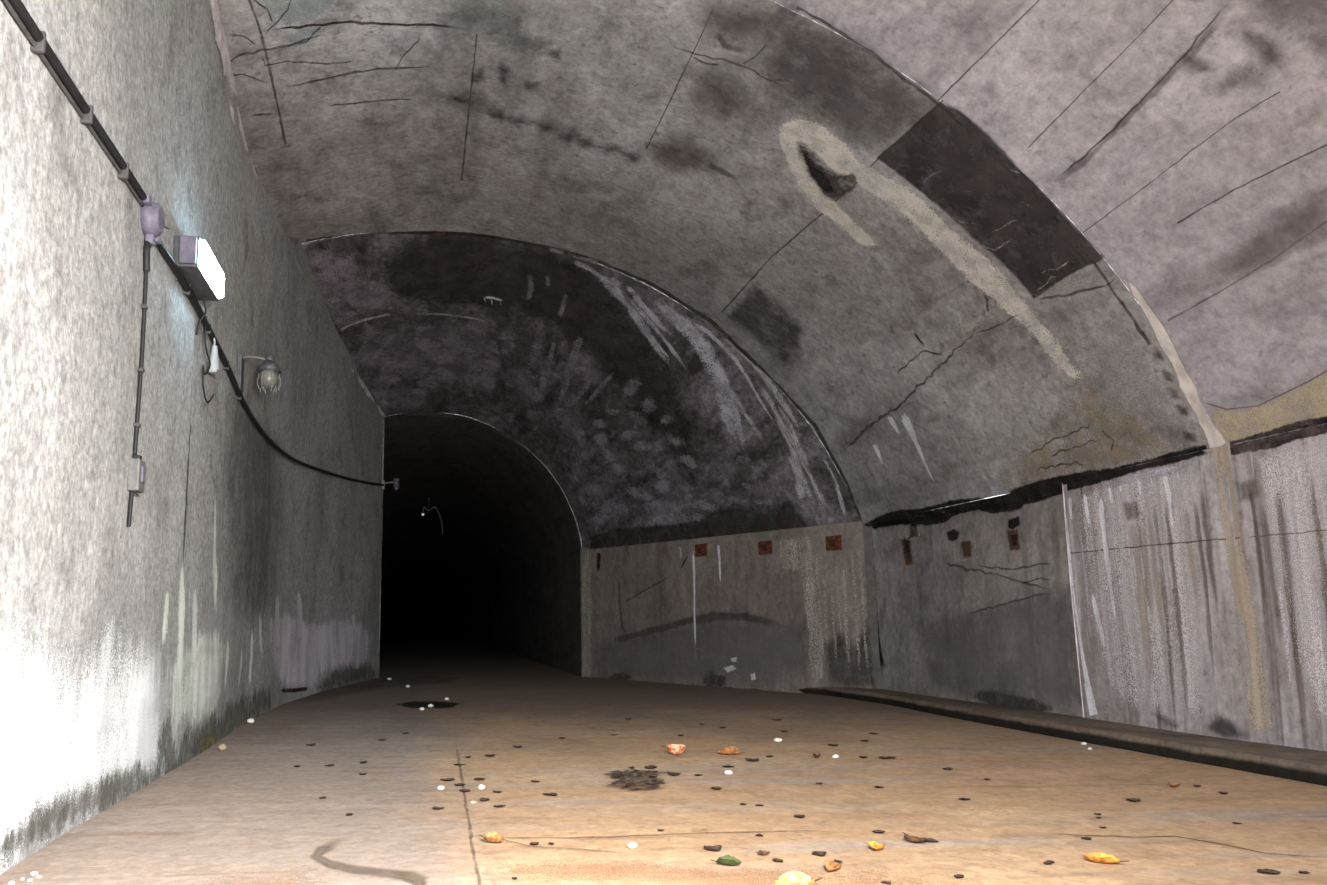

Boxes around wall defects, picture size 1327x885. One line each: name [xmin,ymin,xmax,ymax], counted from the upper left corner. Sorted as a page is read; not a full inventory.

crack [230,0,450,106]
spalling [798,143,856,200]
leakage [341,313,486,330]
leakage [717,13,1327,731]
leakage [0,416,450,875]
leakage [188,845,425,885]